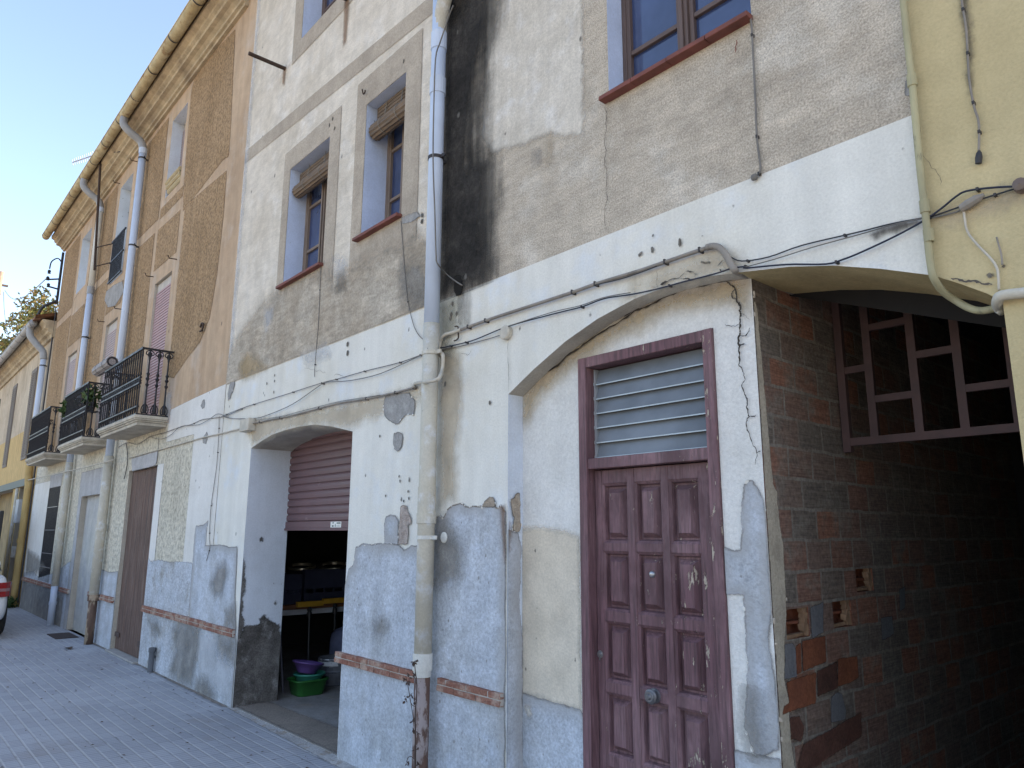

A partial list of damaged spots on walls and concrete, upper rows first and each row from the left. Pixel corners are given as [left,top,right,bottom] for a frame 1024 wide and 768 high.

leakage [440,0,500,333]
peeling [138,521,237,707]
peeling [337,475,417,768]
spalling [383,393,415,451]
peeling [428,493,583,768]
crack [549,261,760,463]
peeling [724,291,874,768]